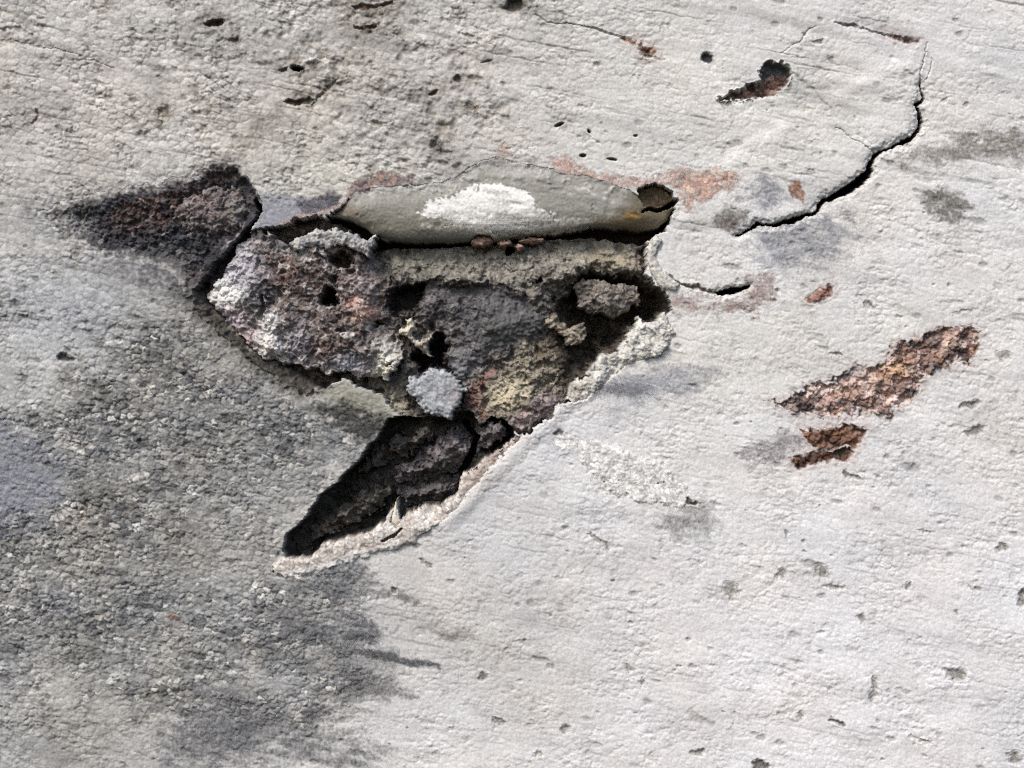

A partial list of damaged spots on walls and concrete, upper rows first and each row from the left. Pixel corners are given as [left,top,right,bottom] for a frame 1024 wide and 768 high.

crack [782,22,887,54]
hole [715,59,794,104]
crack [735,42,934,237]
efflorescence [416,183,592,241]
crack [668,274,751,296]
spalling [36,157,701,580]
corrosion [761,324,981,471]